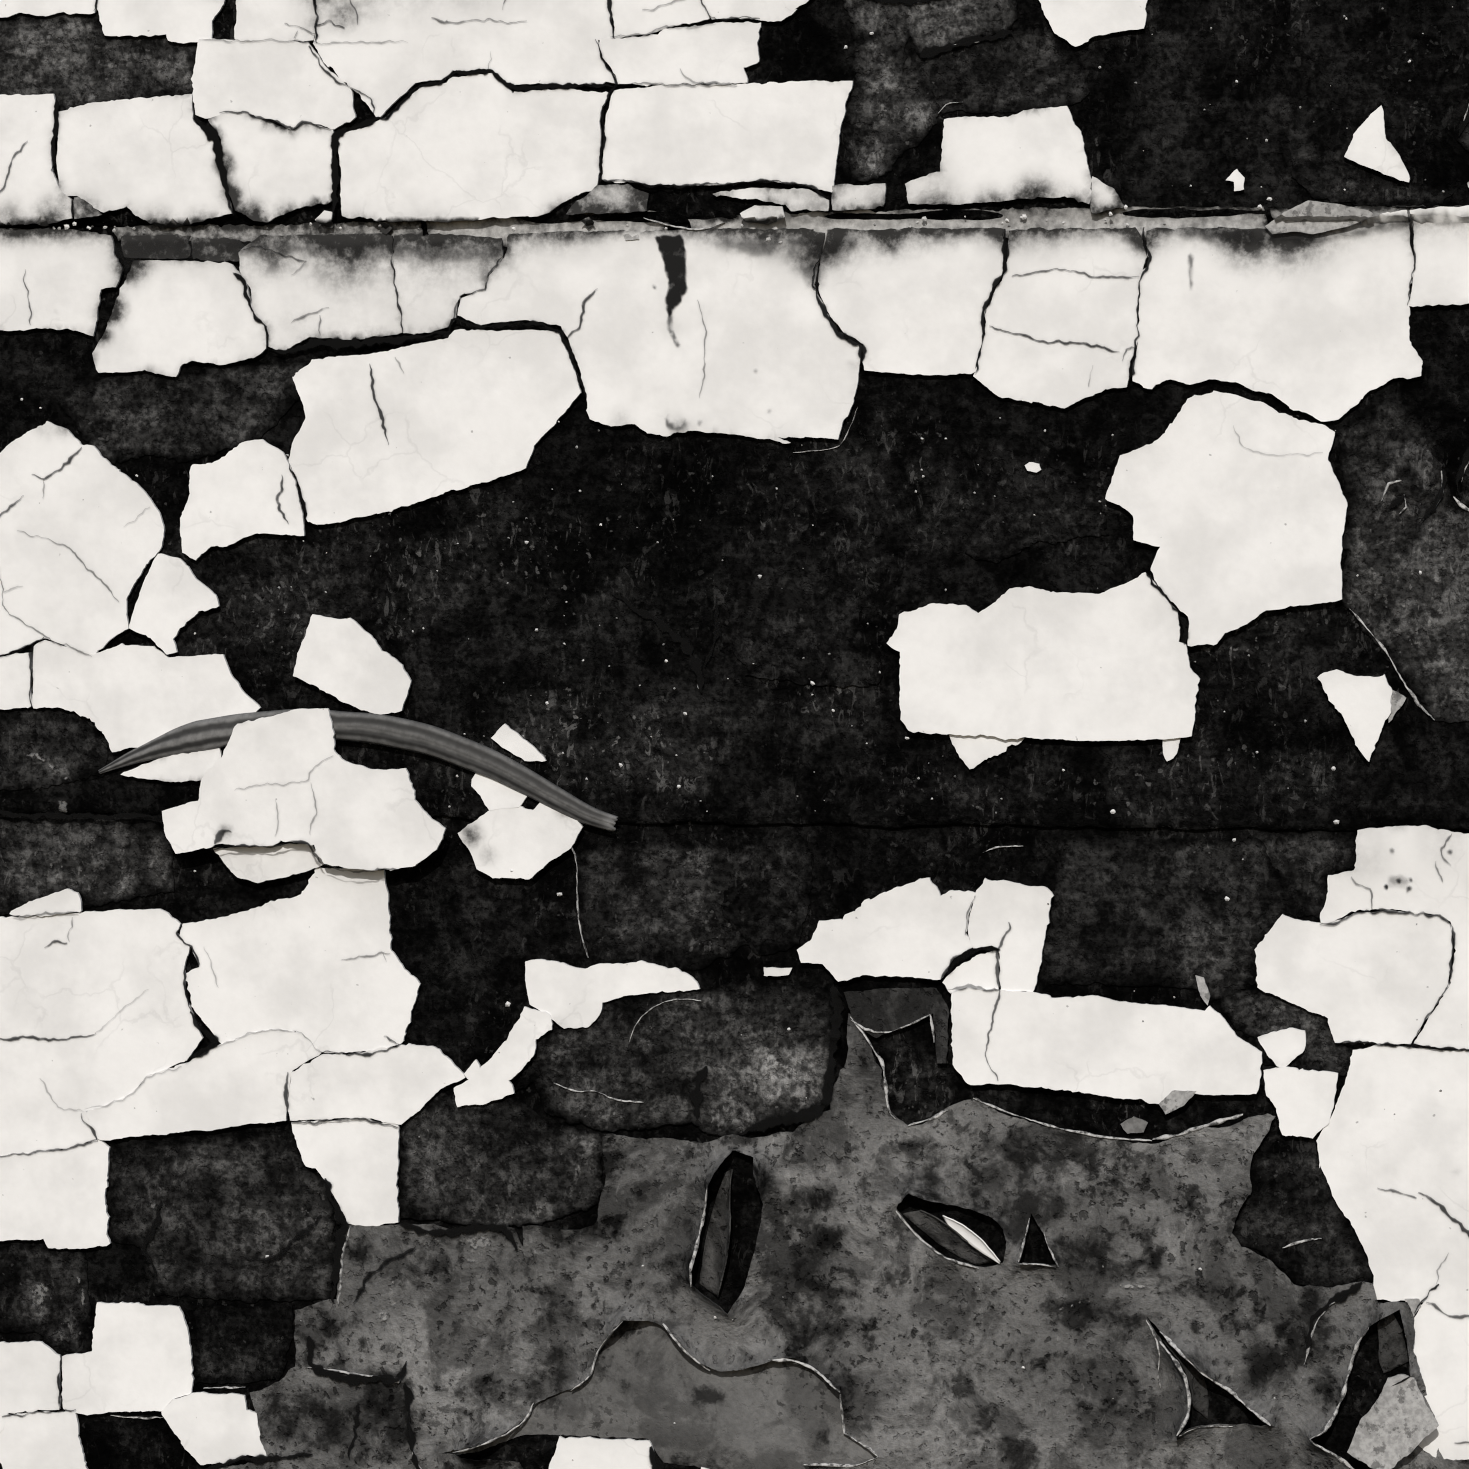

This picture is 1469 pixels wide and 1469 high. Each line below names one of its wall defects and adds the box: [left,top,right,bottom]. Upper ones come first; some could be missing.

crack [0,98,74,218]
crack [193,0,827,445]
crack [811,256,867,367]
crack [975,227,1152,378]
peeling [0,0,1469,791]
crack [0,579,89,708]
crack [0,1033,94,1041]
crack [176,925,219,1062]
crack [283,1072,399,1128]
peeling [0,708,1469,1469]
crack [1325,880,1469,1051]
crack [1378,1188,1469,1236]